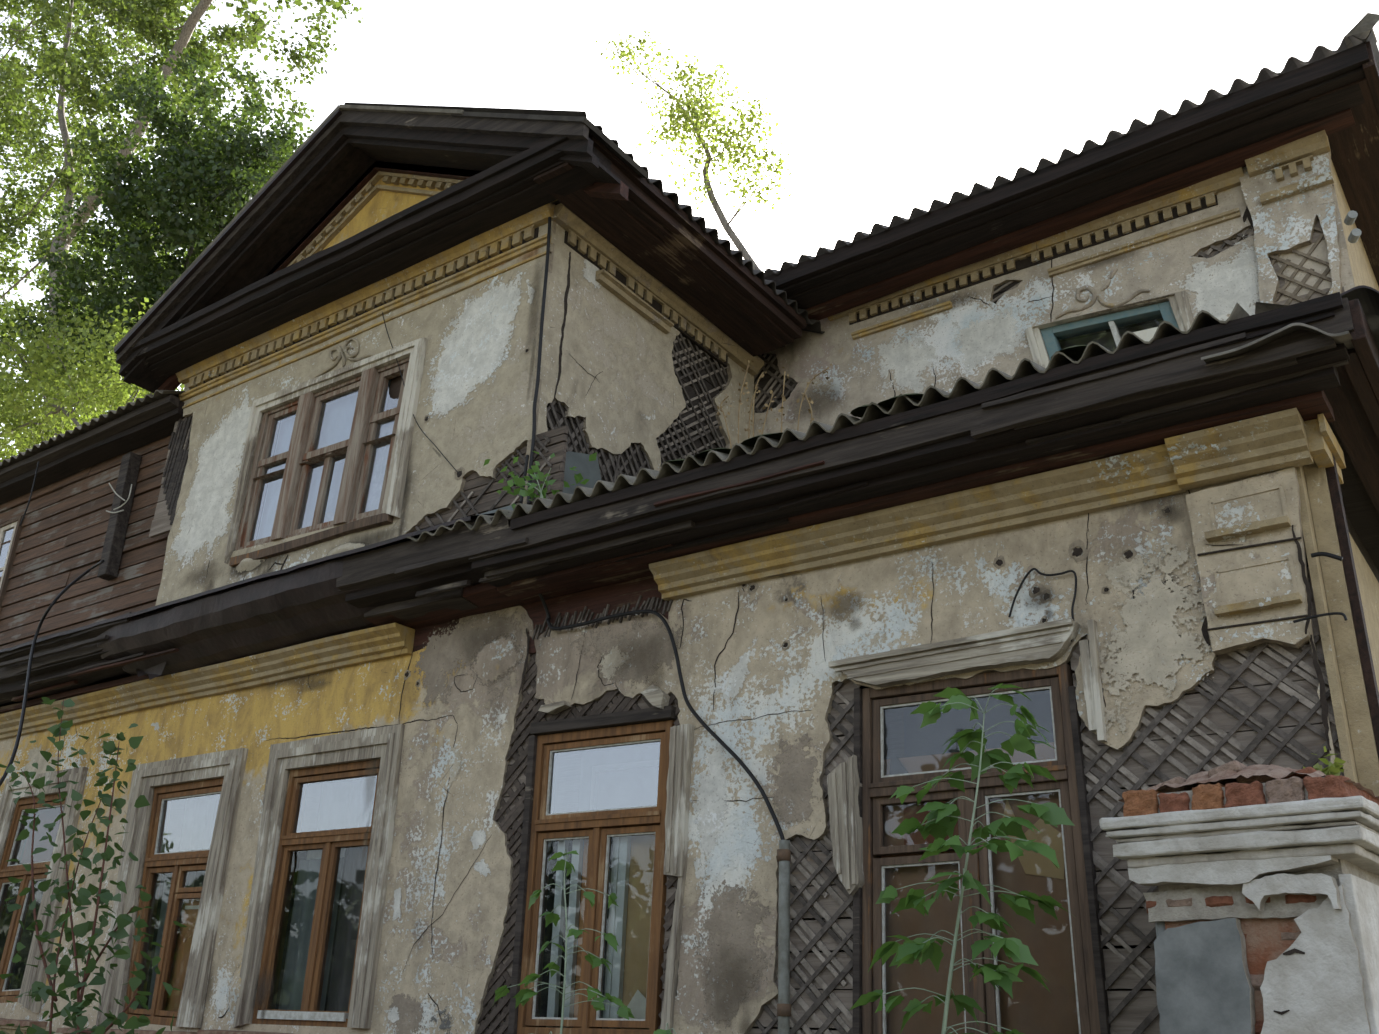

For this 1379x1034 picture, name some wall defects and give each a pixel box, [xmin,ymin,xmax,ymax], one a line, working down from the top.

flaking render [407,333,728,534]
crack [553,252,603,401]
flaking render [754,353,798,413]
peeling [1175,218,1345,321]
peeling [989,555,1010,611]
spalling [1029,582,1053,623]
crack [266,652,492,971]
flaking render [404,609,684,1034]
flaking render [692,680,861,1034]
flaking render [1080,543,1344,1034]